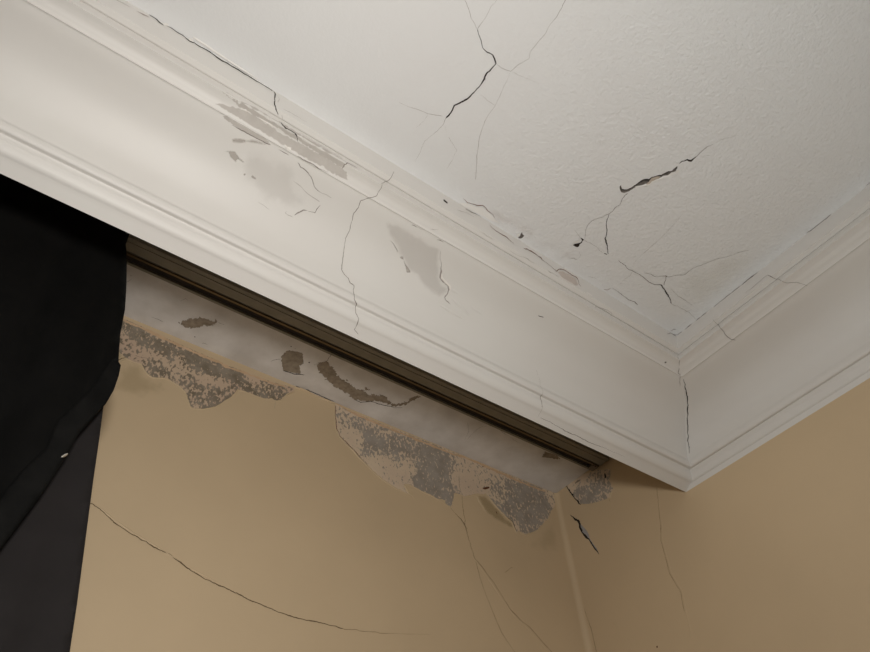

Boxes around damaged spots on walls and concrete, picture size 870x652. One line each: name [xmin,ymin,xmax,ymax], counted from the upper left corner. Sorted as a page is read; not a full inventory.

crack [117,0,301,141]
peeling [217,92,355,180]
crack [399,1,565,180]
crack [341,172,394,334]
crack [460,137,798,340]
crack [90,502,398,634]
peeling [119,317,555,536]
peeling [571,516,599,554]
flaking render [565,469,613,505]
crack [678,360,689,446]